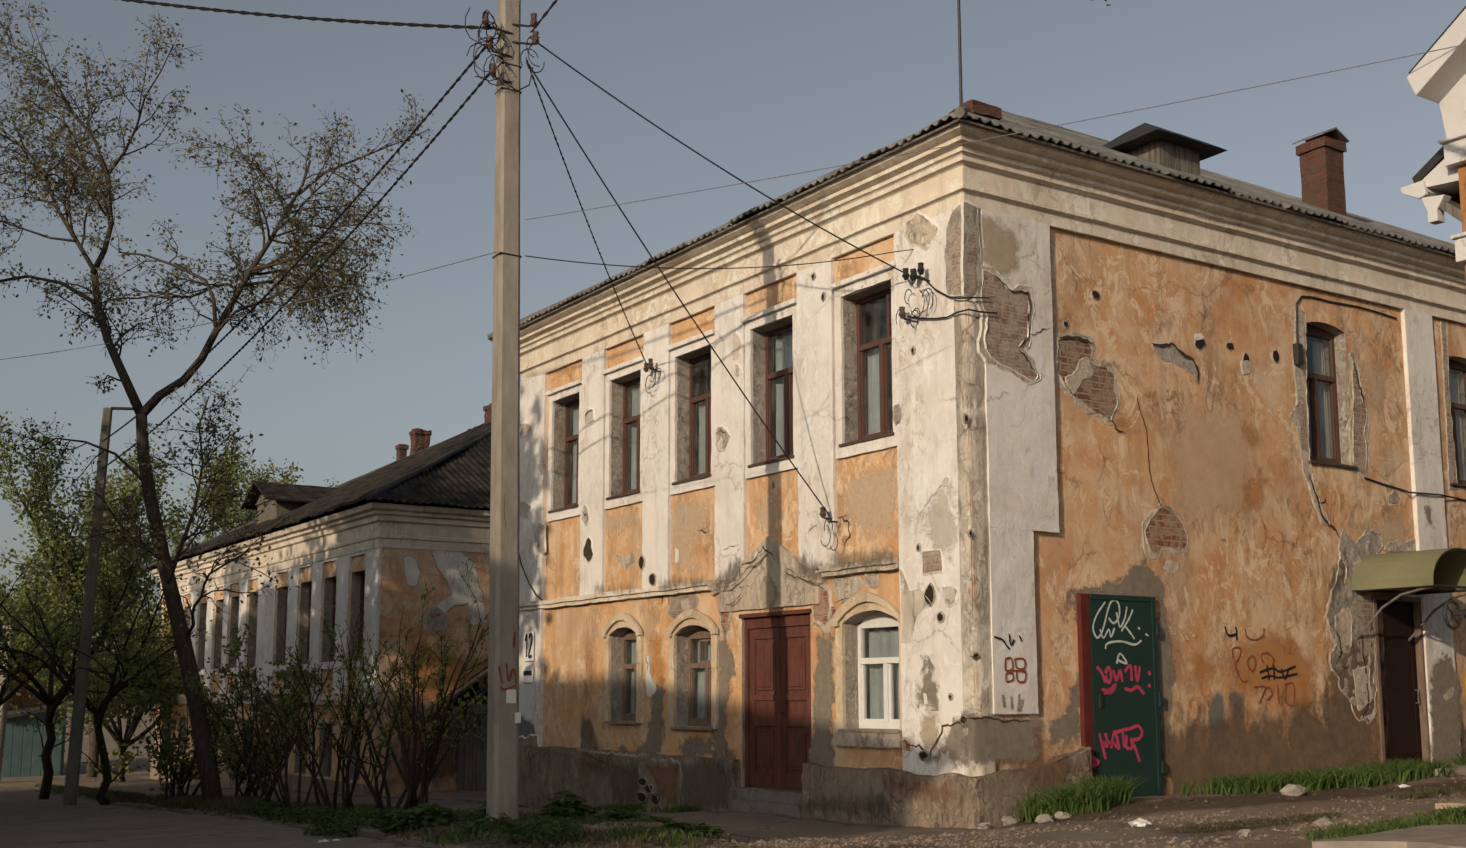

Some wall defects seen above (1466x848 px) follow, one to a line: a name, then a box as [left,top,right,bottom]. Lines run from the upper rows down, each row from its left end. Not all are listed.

flaking render [904,200,1121,428]
peeling [1151,333,1207,384]
crack [1112,396,1164,506]
peeling [403,550,487,626]
flaking render [1141,502,1191,574]
spalling [1272,308,1416,724]
water stain [1161,617,1384,796]